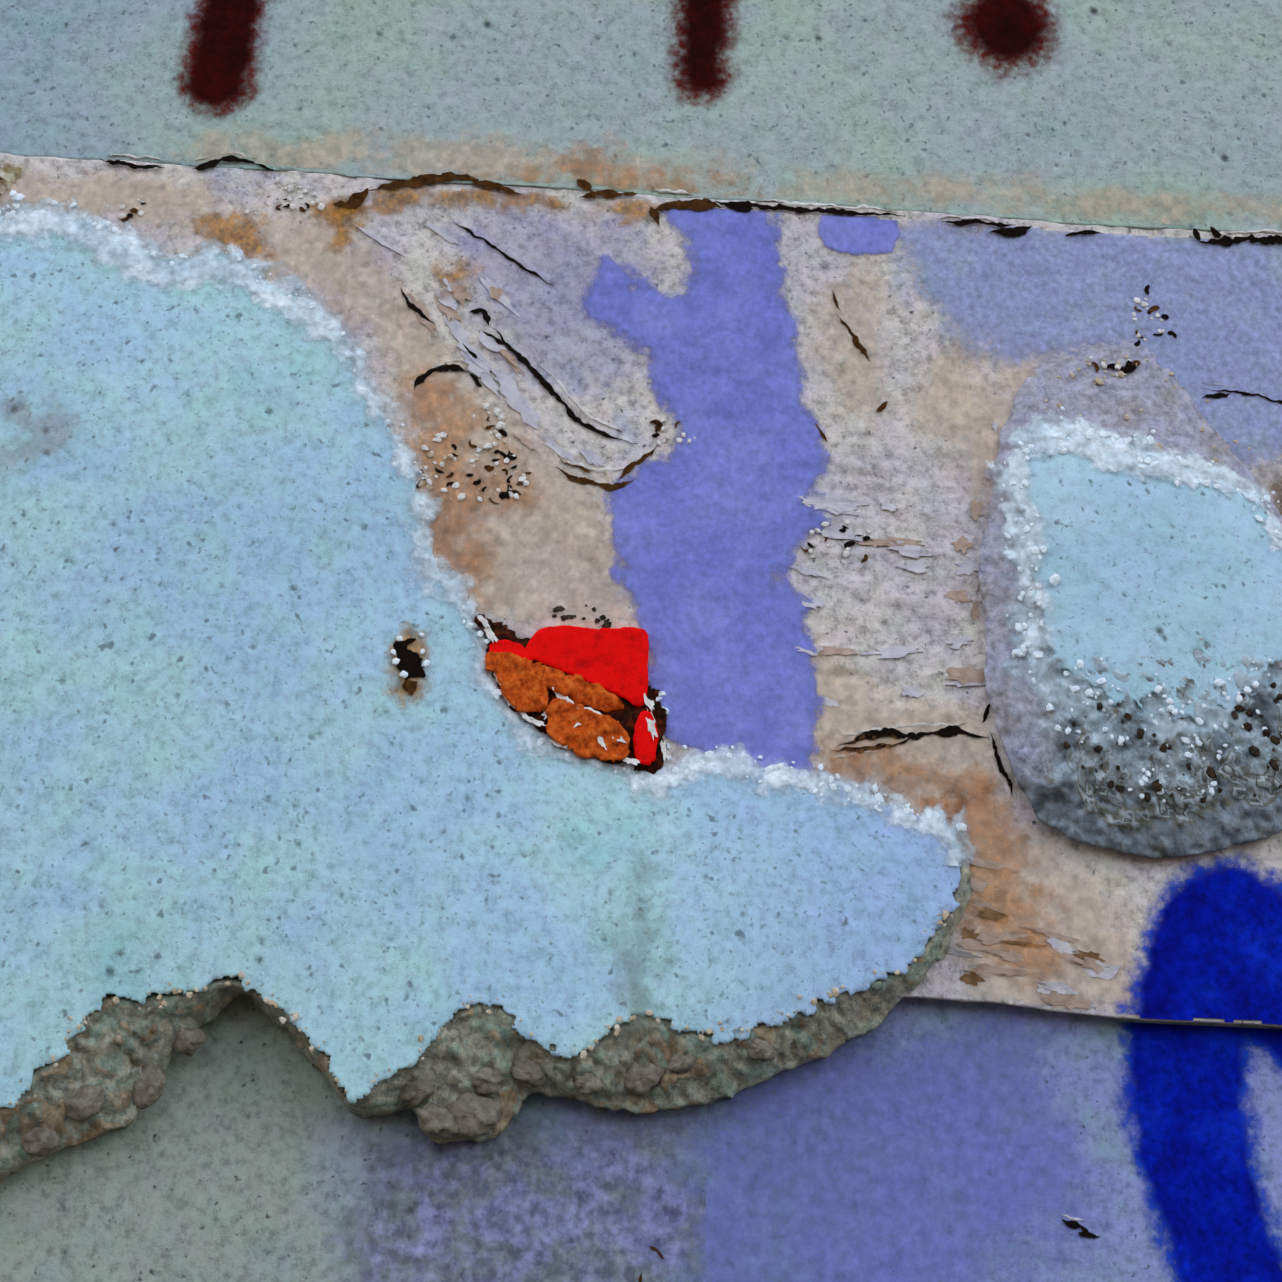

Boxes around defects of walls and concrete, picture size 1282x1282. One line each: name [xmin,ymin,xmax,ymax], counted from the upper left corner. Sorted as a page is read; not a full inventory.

crack [99,152,274,171]
crack [333,171,526,209]
crack [577,179,901,225]
crack [454,222,554,287]
crack [943,215,1032,237]
crack [1065,229,1104,237]
crack [1189,226,1282,247]
crack [401,289,435,324]
crack [409,308,657,491]
crack [1203,383,1282,404]
spalling [944,285,1282,858]
spalling [0,161,1122,1185]